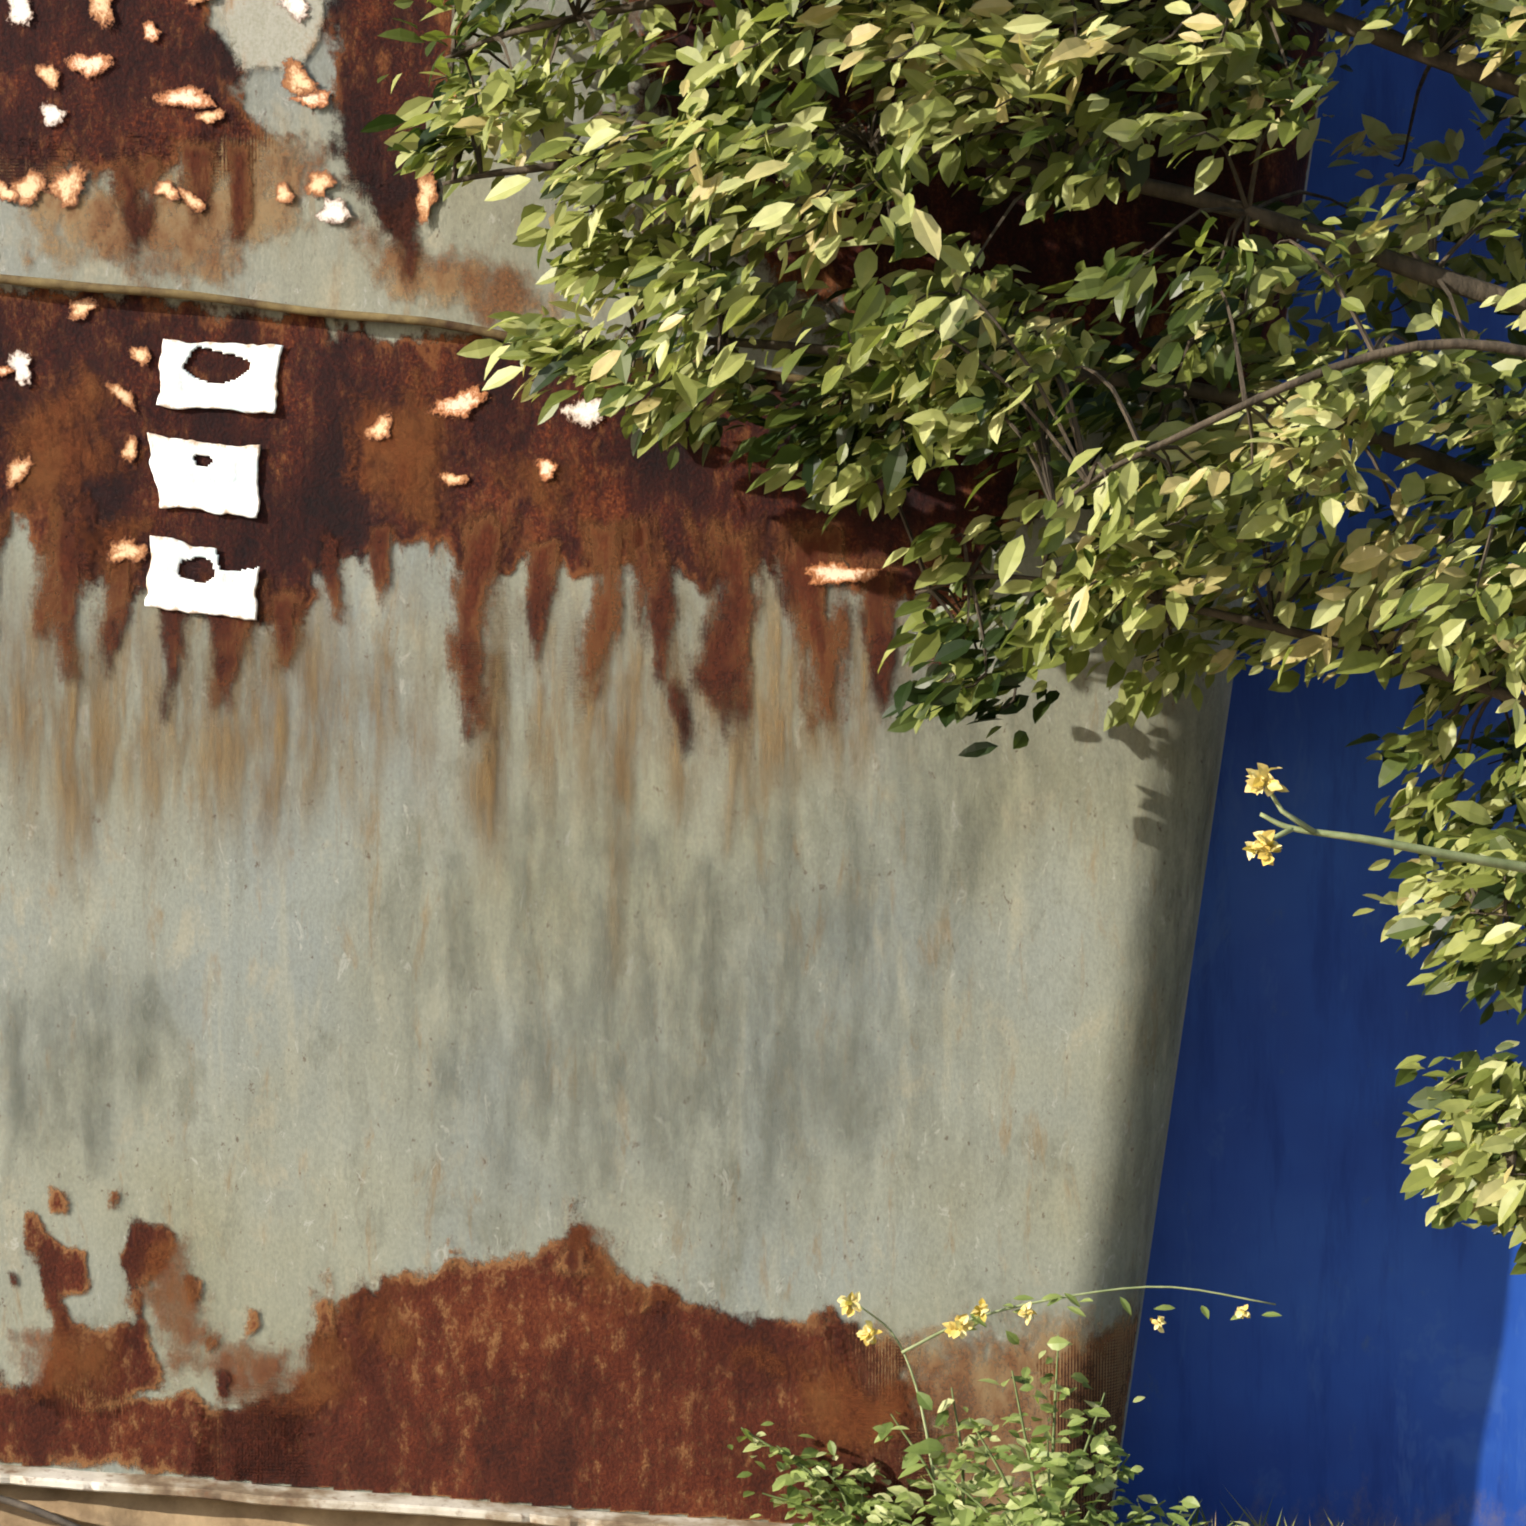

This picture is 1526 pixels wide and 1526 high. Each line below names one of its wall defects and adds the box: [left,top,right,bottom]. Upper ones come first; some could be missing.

peeling [224,0,331,109]
peeling [275,169,353,224]
rust [743,0,1327,410]
rust [0,0,1044,806]
rust [0,1186,1137,1526]